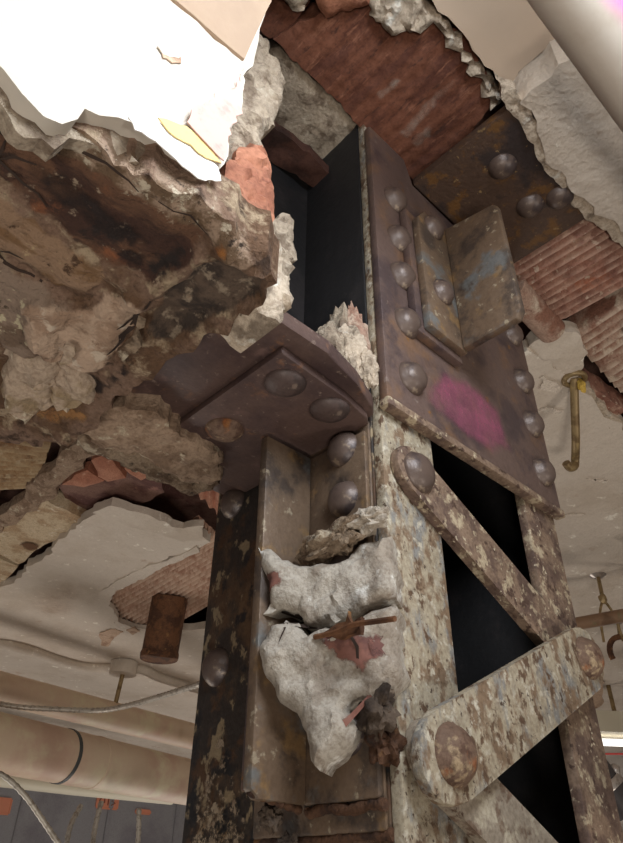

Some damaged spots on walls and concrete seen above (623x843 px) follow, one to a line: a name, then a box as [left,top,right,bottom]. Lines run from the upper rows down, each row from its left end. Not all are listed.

peeling [128,67,246,182]
crack [0,132,47,207]
crack [82,151,139,192]
crack [158,201,209,236]
crack [0,251,43,283]
spalling [89,315,146,393]
spalling [579,376,623,430]
spalling [98,515,215,647]
corrosion [364,724,408,767]
corrosion [246,791,395,843]